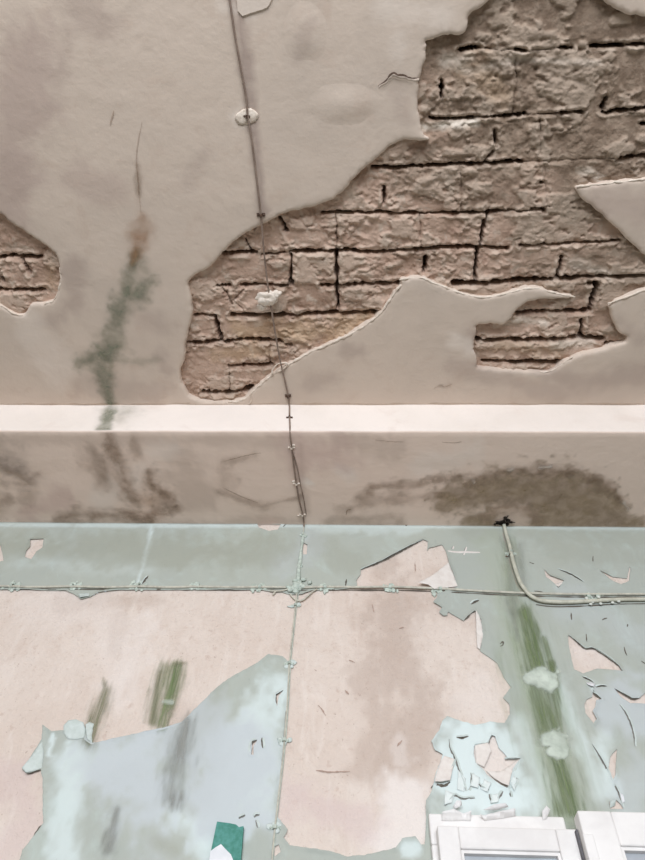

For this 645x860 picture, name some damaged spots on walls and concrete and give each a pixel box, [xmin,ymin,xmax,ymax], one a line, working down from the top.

spalling [181,0,645,404]
spalling [0,213,61,316]
water stain [88,344,120,430]
water stain [440,466,636,527]
water stain [152,662,182,728]
peeling [0,539,520,860]
water stain [520,607,577,817]
peeling [568,636,622,723]